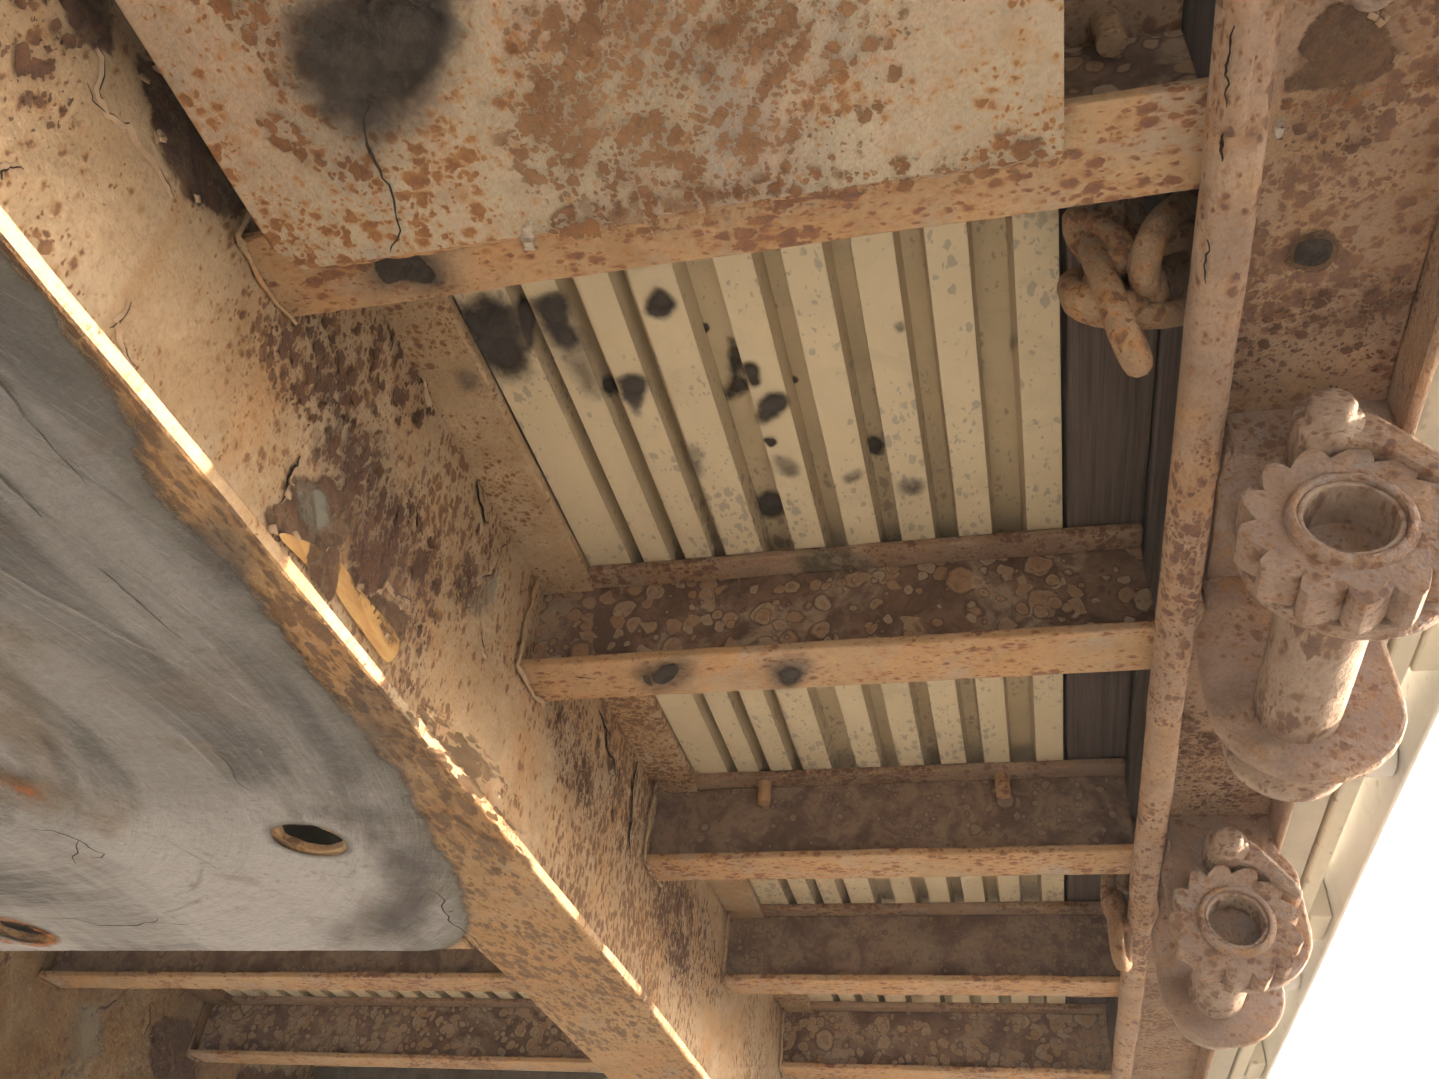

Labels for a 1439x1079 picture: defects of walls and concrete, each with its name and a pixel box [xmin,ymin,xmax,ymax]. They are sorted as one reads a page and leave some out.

corrosion [190,0,301,88]
corrosion [256,113,376,195]
corrosion [497,0,1074,240]
corrosion [1279,3,1410,158]
corrosion [1233,275,1420,392]
corrosion [148,1015,199,1079]
corrosion [236,1066,298,1079]